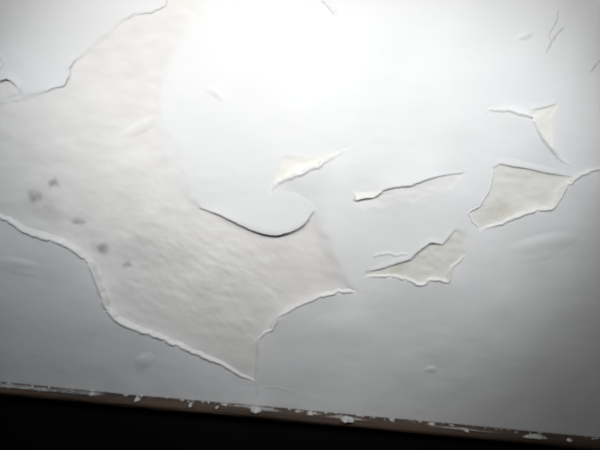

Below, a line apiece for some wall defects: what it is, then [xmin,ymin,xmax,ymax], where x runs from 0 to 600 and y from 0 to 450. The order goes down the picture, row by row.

peeling [0,0,358,381]
peeling [352,97,600,287]